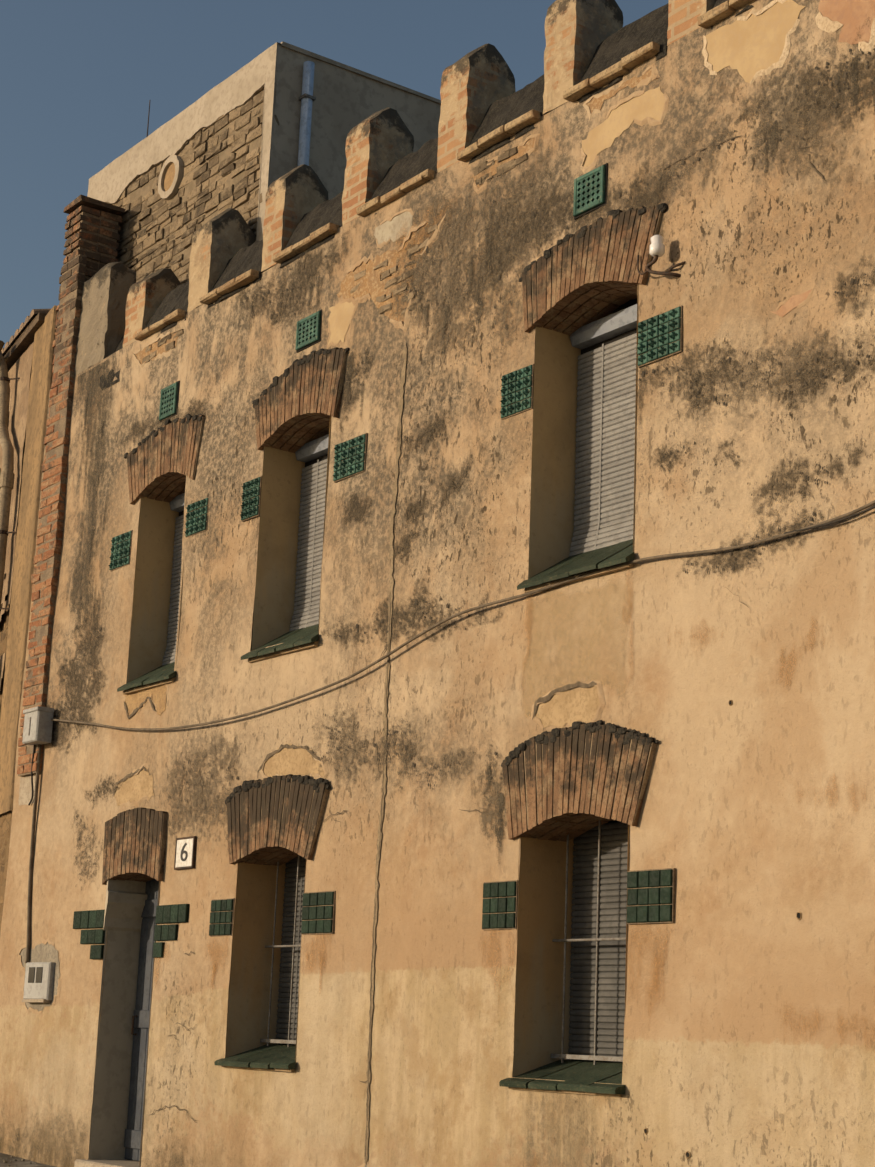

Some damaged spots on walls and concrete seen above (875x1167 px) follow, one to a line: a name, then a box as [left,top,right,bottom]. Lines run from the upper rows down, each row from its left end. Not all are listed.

spalling [702,0,875,85]
spalling [580,63,669,174]
leakage [390,44,875,363]
spalling [327,209,449,349]
leakage [638,331,875,419]
leakage [120,398,206,444]
leakage [683,445,862,576]
leakage [45,357,114,754]
spalling [531,680,606,731]
spalling [113,763,154,807]
spalling [257,743,329,780]